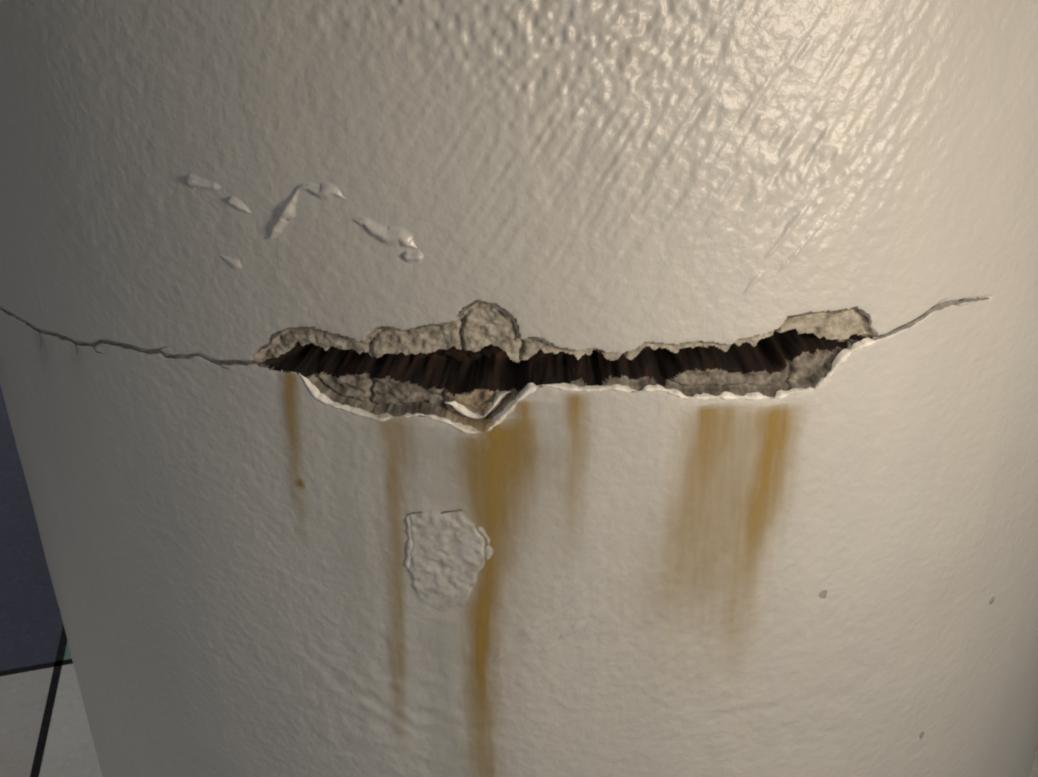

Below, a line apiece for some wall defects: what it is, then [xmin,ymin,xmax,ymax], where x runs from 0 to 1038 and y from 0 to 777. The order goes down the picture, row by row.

crack [0,308,262,370]
spalling [252,300,880,434]
crack [873,298,990,339]
rust [285,374,295,443]
rust [698,408,718,472]
rust [748,409,788,553]
rust [472,403,529,718]